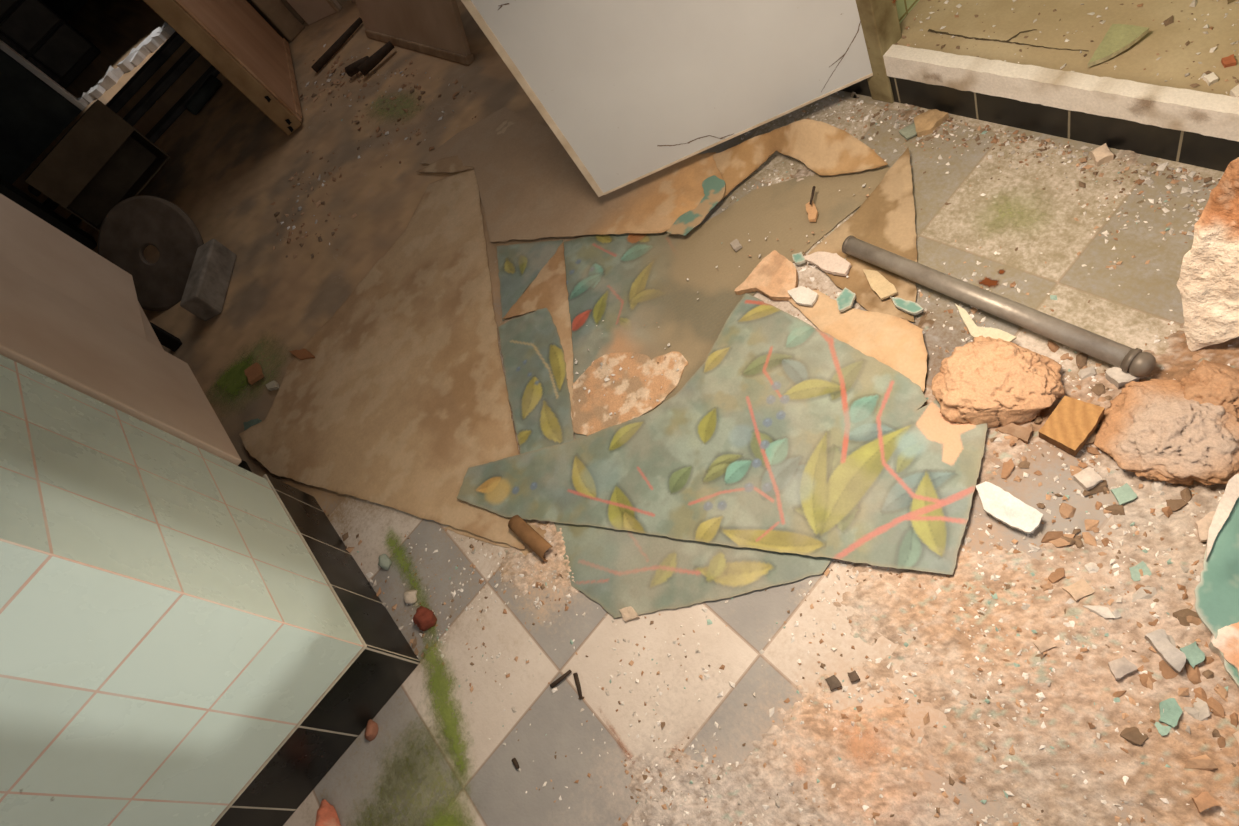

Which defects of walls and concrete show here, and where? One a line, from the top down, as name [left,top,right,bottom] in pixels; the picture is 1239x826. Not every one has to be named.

crack [928,29,1089,51]
peeling [667,175,725,236]
flaking render [805,200,818,222]
flaking render [788,252,924,315]